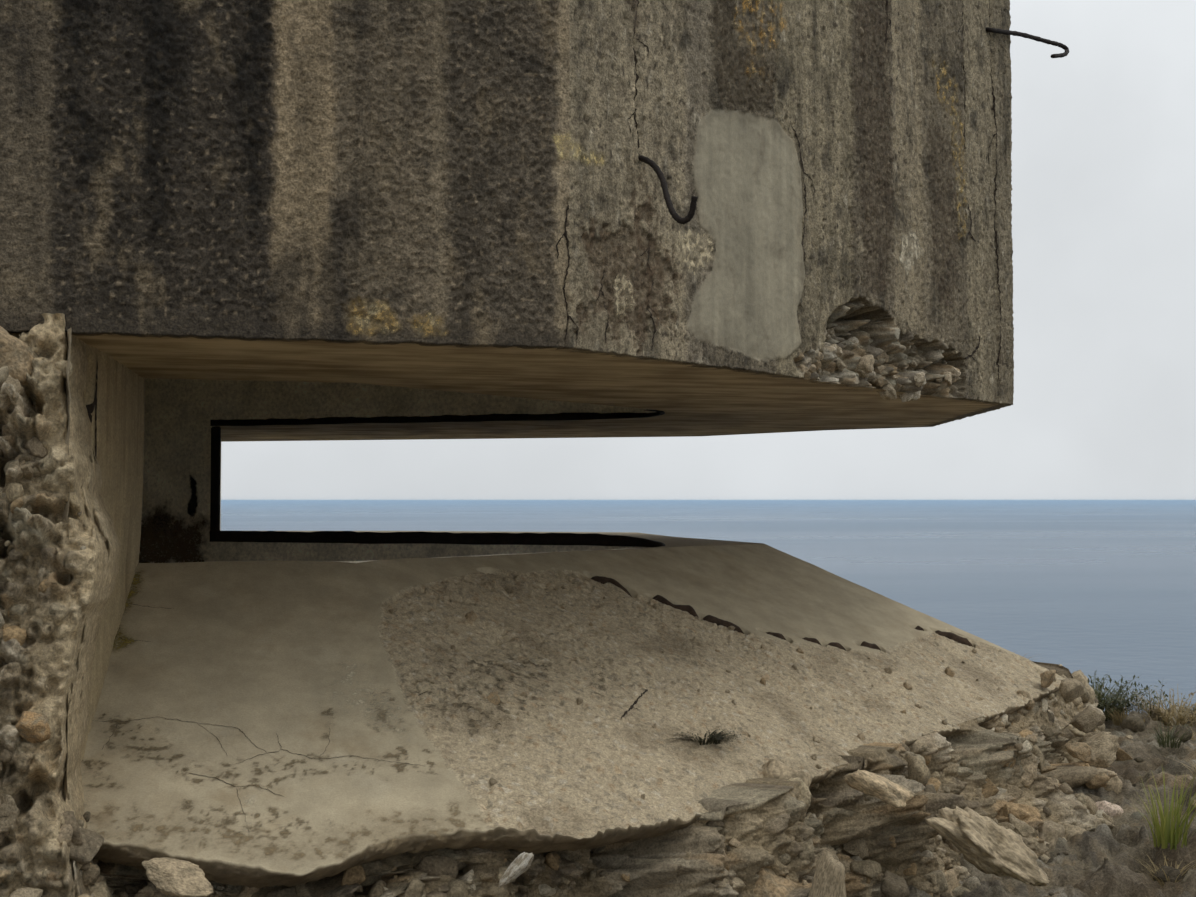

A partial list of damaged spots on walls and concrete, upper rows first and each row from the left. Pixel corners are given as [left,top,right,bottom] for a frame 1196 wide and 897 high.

crack [628,0,649,148]
crack [958,1,1002,379]
crack [556,201,609,347]
spalling [792,296,966,402]
crack [92,717,426,831]
spalling [378,569,1066,839]